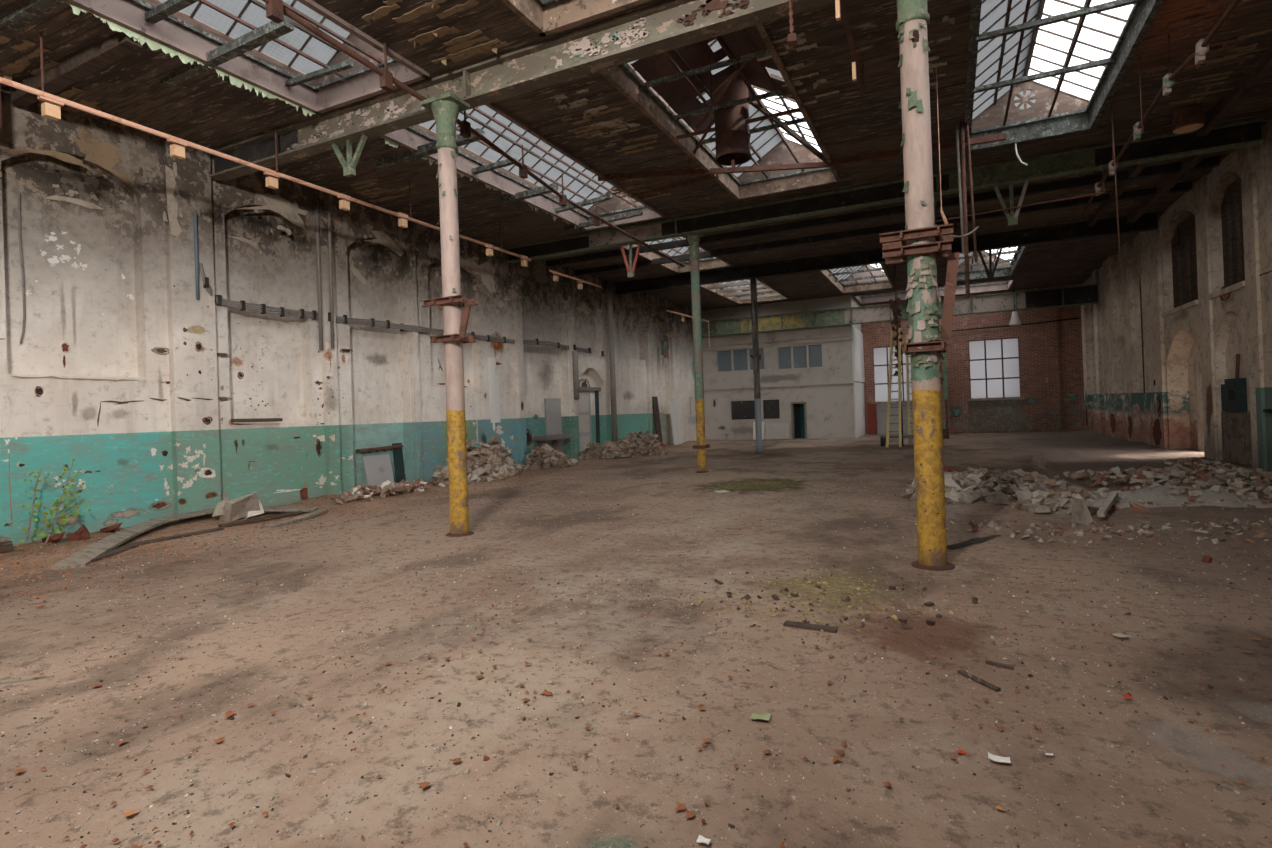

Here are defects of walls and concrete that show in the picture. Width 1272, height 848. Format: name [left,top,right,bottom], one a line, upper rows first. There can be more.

peeling [359,114,438,165]
peeling [40,231,88,270]
peeling [104,443,228,525]